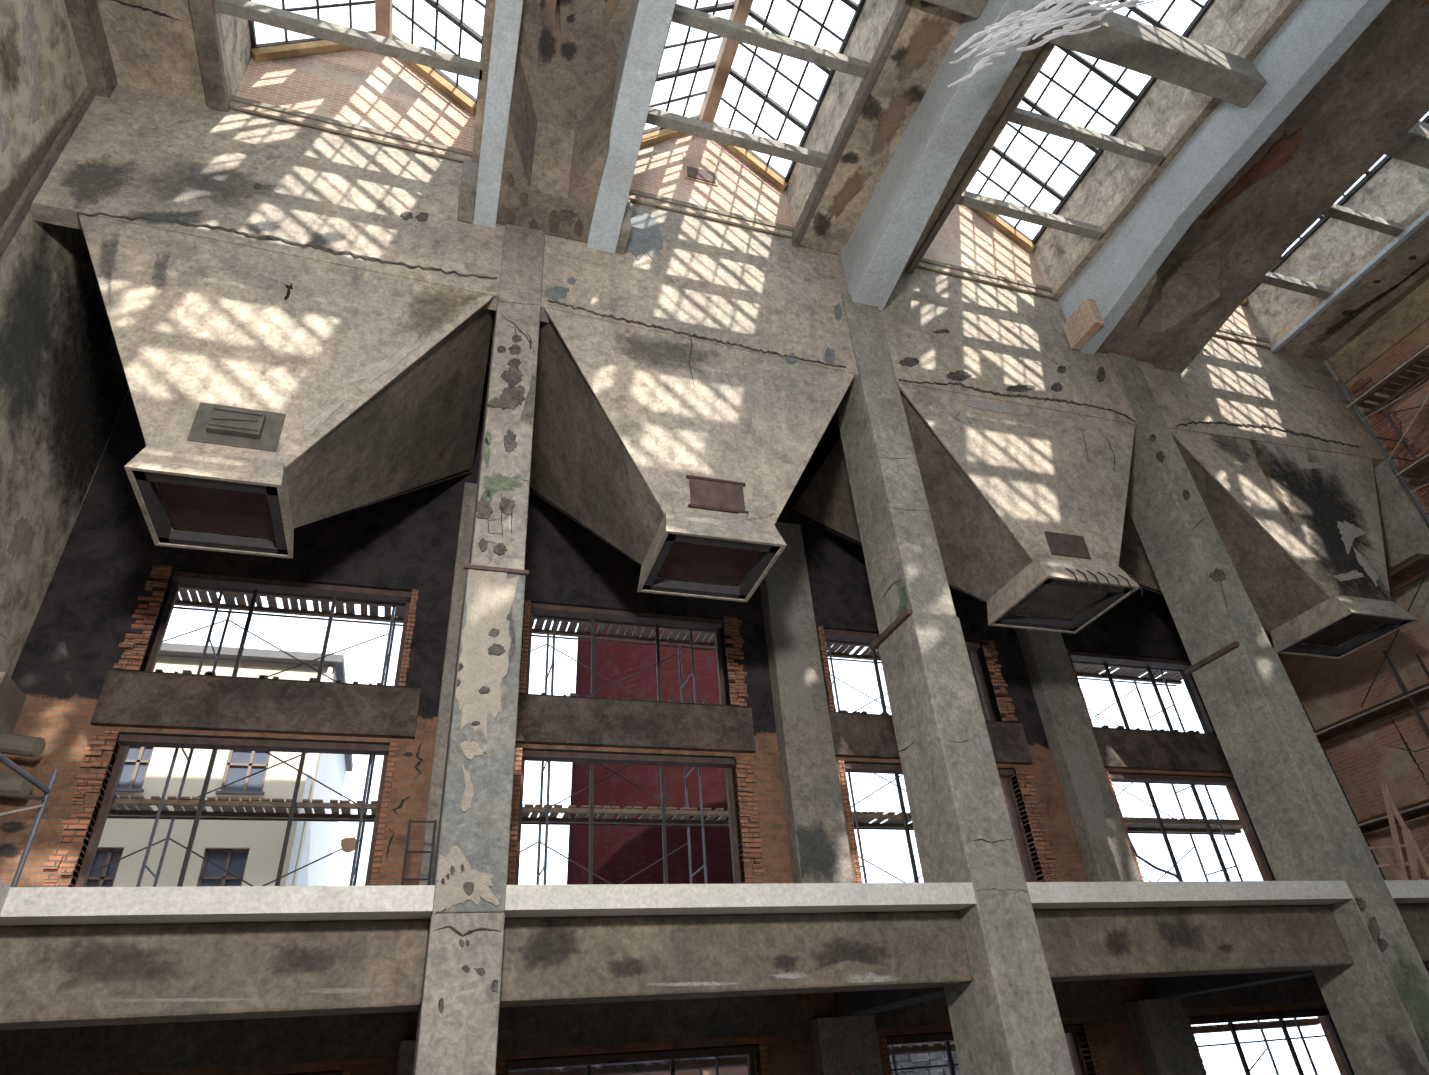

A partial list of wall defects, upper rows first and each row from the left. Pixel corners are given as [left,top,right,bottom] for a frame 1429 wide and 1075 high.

leakage [63,163,127,203]
spalling [486,335,526,411]
spalling [503,429,517,453]
spalling [476,497,515,519]
flaking render [455,538,520,812]
flaking render [433,845,500,916]
spalling [462,965,498,992]
leakage [611,959,643,976]
leakage [775,956,799,978]
leakage [823,940,889,983]